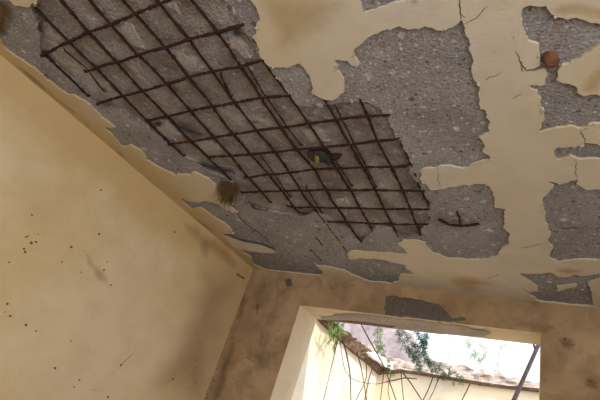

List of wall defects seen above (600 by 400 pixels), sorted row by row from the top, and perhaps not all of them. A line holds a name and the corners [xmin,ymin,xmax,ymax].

peeling [521,5,600,130]
spalling [0,0,510,287]
peeling [554,143,600,158]
peeling [541,180,600,262]
peeling [520,272,600,305]
peeling [317,295,539,392]